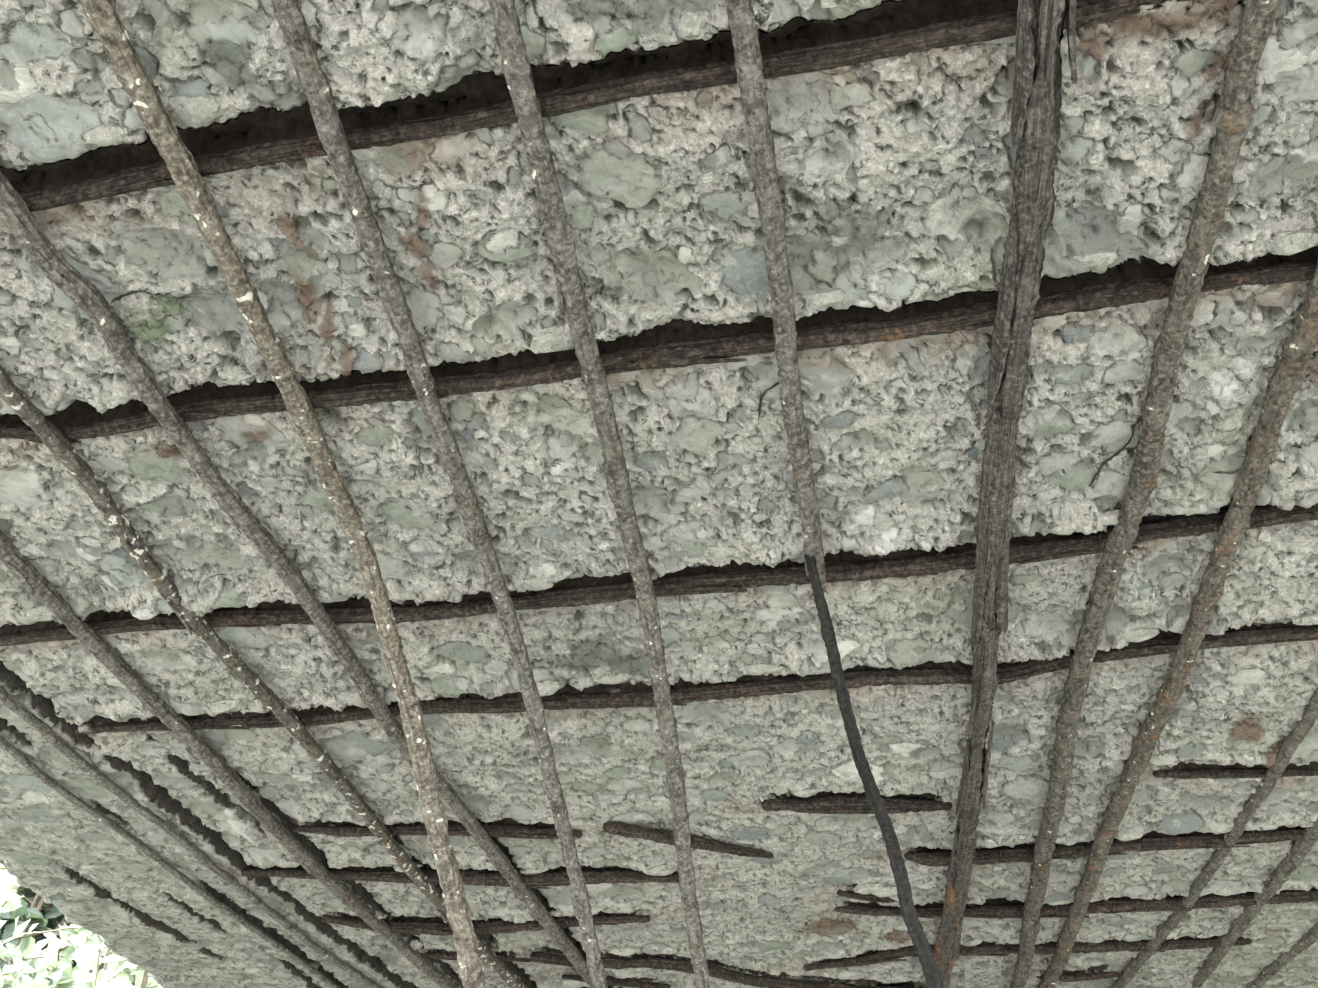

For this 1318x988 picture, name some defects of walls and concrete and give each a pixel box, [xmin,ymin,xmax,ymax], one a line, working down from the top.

rust [400,198,436,289]
rust [296,281,353,375]
rust [156,445,182,458]
spalling [0,661,172,748]
spalling [762,554,952,988]
spalling [1107,688,1318,855]
rust [1232,716,1286,767]
spalling [0,687,418,988]
spalling [435,768,593,988]
spalling [1086,847,1257,914]
rust [800,919,856,936]
rust [884,930,910,944]